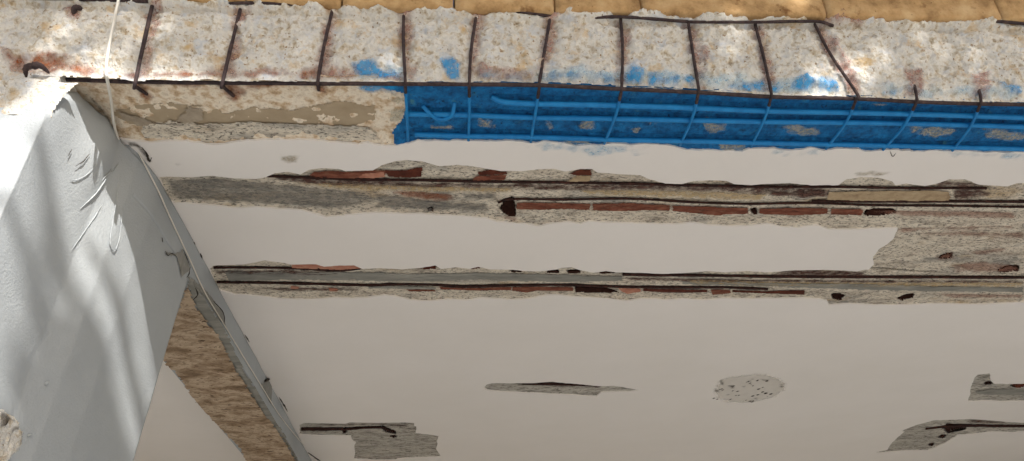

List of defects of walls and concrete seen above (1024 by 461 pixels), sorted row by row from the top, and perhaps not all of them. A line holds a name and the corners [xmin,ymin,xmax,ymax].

spalling [0,0,1024,152]
spalling [160,160,1024,461]